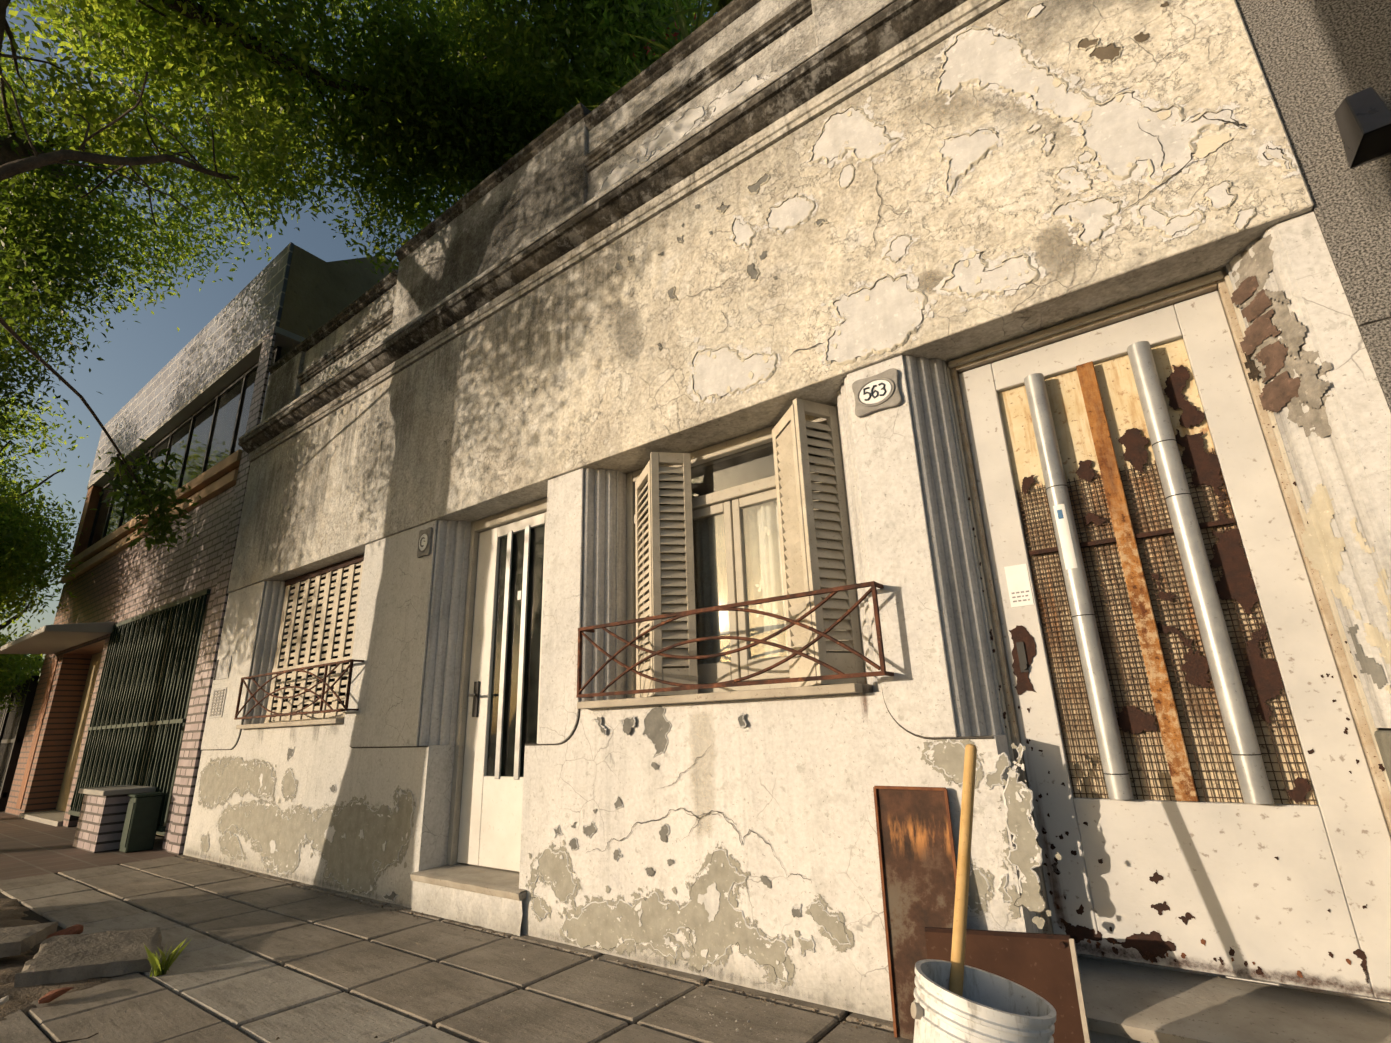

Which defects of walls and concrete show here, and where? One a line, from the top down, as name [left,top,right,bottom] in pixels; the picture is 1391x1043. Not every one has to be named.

peeling [806,96,907,189]
peeling [933,2,1301,250]
peeling [687,337,781,406]
peeling [695,192,829,282]
peeling [821,233,1046,369]
spalling [1231,234,1334,438]
corrosion [1118,428,1149,478]
corrosion [1117,705,1158,734]
peeling [198,747,416,914]
crack [586,745,810,880]
peeling [917,739,1062,929]
peeling [507,809,855,1040]